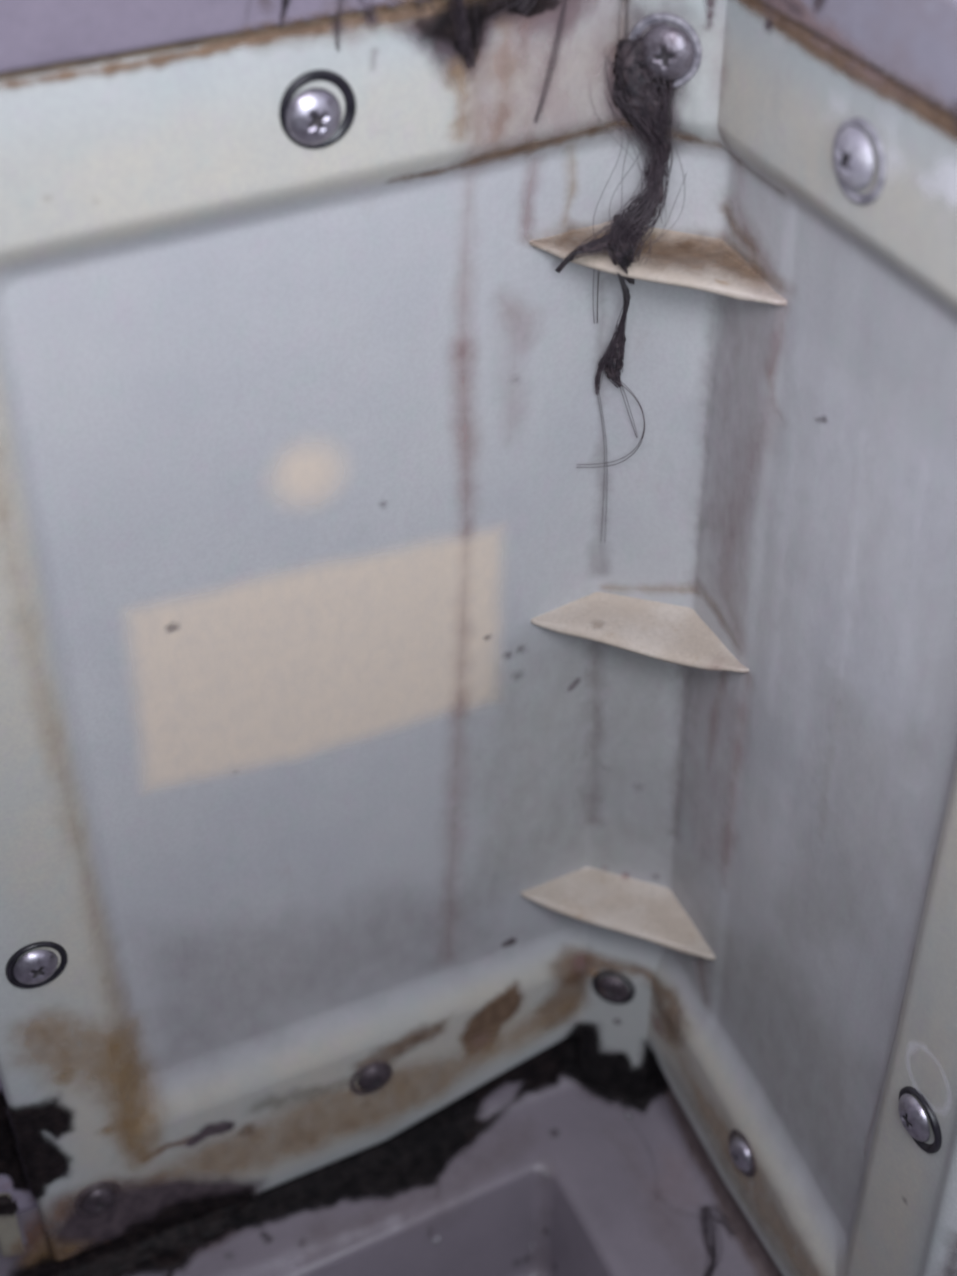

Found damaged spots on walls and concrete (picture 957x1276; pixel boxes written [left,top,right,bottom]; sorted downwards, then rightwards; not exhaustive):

corrosion [357,1021,446,1072]
corrosion [459,982,523,1054]
corrosion [537,949,684,1043]
damp [0,1092,72,1215]
corrosion [144,1121,254,1162]
damp [14,998,670,1276]